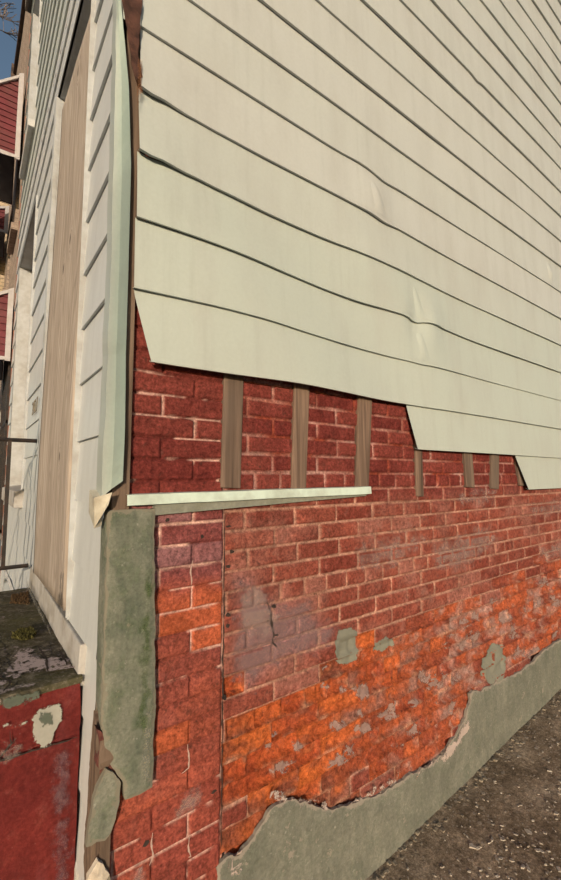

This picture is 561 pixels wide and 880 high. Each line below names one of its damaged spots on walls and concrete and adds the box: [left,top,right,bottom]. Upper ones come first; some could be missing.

peeling [0,648,75,748]
flaking render [86,857,111,880]
flaking render [84,508,170,847]
spalling [211,552,561,880]